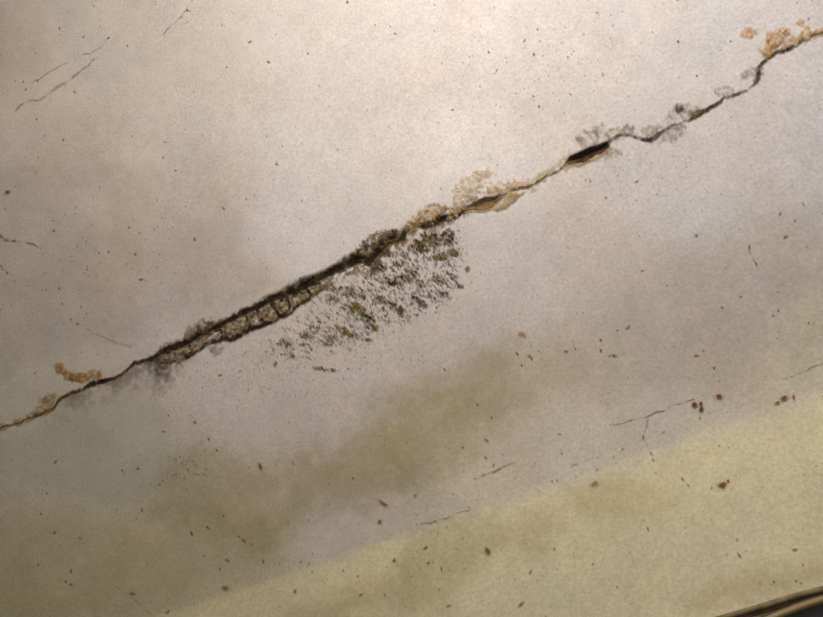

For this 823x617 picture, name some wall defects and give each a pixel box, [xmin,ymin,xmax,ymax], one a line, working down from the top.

rust [759,18,816,57]
mould [269,225,470,371]
crack [0,28,823,430]
rust [55,364,101,382]